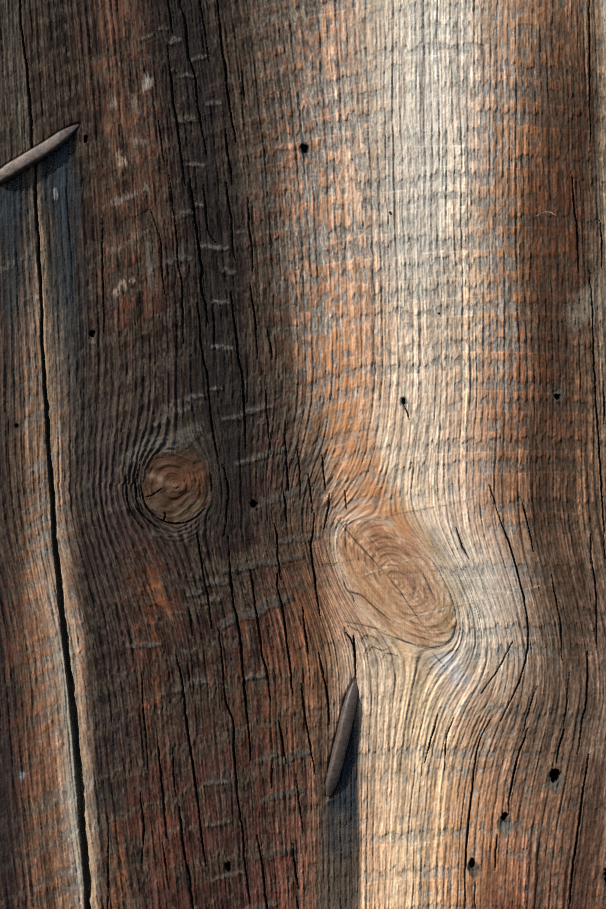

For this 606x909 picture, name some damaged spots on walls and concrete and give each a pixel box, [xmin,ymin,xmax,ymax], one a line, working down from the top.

crack [589,0,606,133]
crack [571,181,579,255]
crack [19,0,109,909]
crack [126,0,347,909]
crack [589,220,605,639]
crack [348,531,418,618]
crack [344,583,442,674]
crack [482,489,533,806]
crack [553,588,562,658]
crack [557,663,588,754]
crack [464,731,484,909]
crack [569,767,587,902]